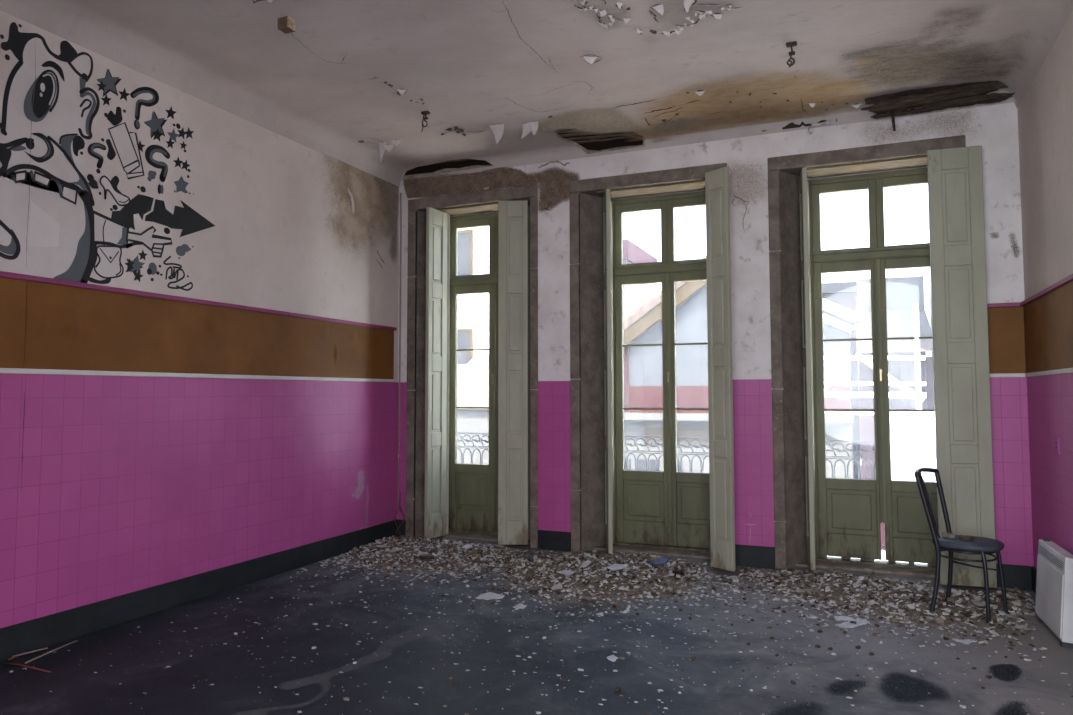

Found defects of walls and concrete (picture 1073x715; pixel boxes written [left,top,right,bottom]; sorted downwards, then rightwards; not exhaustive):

peeling [565,0,742,46]
crack [495,1,593,112]
leakage [538,1,1035,146]
peeling [441,124,504,144]
spalling [521,115,645,154]
leakage [318,153,399,266]
leakage [526,166,580,214]